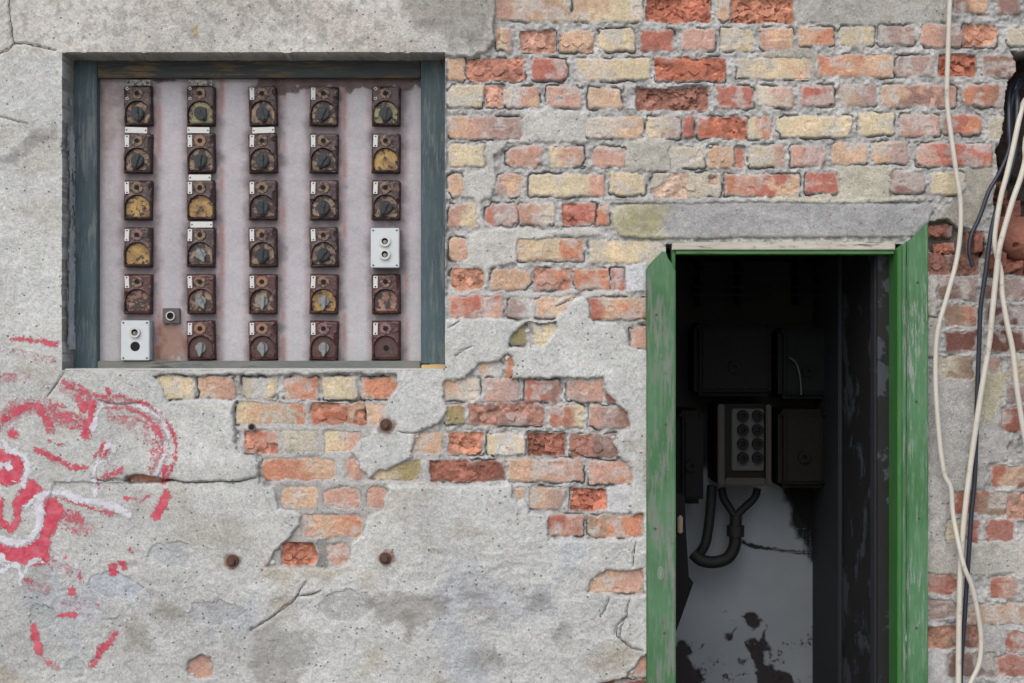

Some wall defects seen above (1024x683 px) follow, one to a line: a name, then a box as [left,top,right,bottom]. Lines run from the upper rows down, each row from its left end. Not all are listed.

spalling [645,0,711,24]
spalling [730,0,795,25]
spalling [467,28,595,109]
spalling [938,25,999,78]
spalling [636,57,748,199]
spalling [993,57,1024,217]
spalling [562,204,598,227]
spalling [928,224,979,276]
peeling [155,321,645,569]
crack [175,475,258,483]
crack [253,588,317,629]
spalling [928,625,979,651]